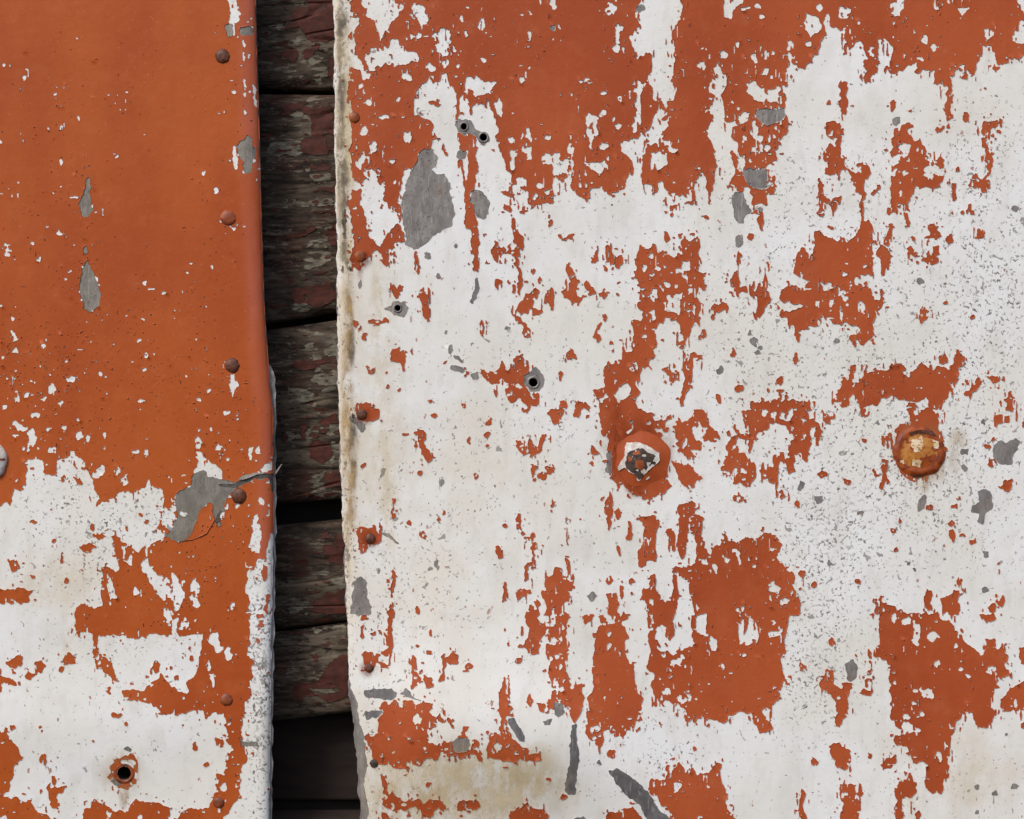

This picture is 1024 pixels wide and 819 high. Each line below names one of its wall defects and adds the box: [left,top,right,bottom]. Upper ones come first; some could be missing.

damp [337,76,351,211]
peeling [30,226,108,323]
peeling [214,0,1024,765]
corrosion [628,450,644,470]
corrosion [900,434,937,469]
crack [179,464,282,543]
peeling [0,306,541,819]
peeling [816,577,1024,819]
peeling [509,798,549,819]
peeling [603,801,642,819]
peeling [648,746,736,819]
peeling [794,788,809,819]